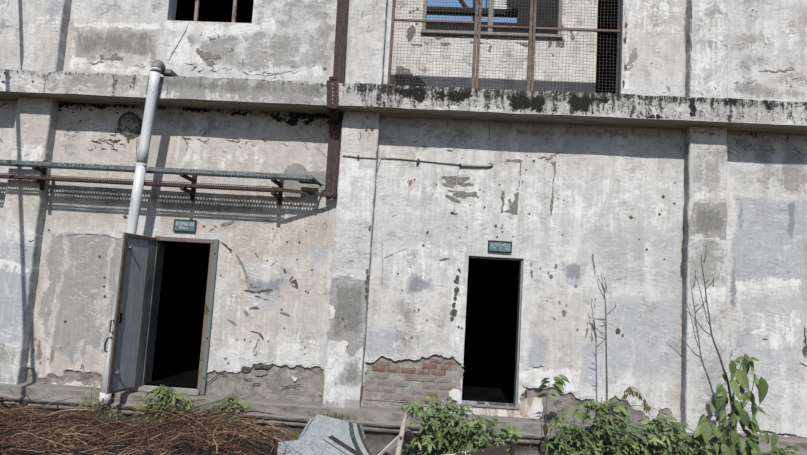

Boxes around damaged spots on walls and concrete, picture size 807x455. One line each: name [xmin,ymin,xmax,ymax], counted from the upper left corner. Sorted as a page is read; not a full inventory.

damp [58,102,145,121]
mould [180,107,247,116]
mould [271,112,330,126]
damp [368,86,472,106]
mould [507,95,545,112]
mould [570,95,610,112]
spalling [436,176,484,206]
peeling [499,149,564,215]
flaking render [26,358,102,386]
flaking render [206,331,325,403]
flaking render [361,353,464,412]
flaking render [485,385,672,426]